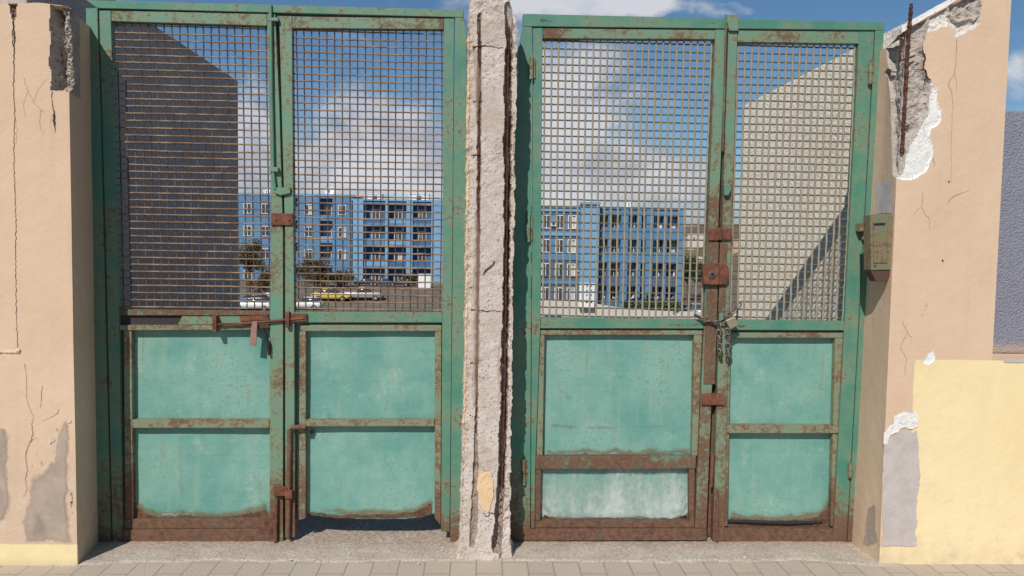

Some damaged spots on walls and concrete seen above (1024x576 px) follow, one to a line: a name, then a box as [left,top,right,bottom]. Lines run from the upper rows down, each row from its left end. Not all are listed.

spalling [48,4,81,99]
spalling [876,0,982,214]
crack [916,42,957,168]
crack [12,21,59,494]
spalling [501,36,509,487]
flaking render [923,350,935,365]
flaking render [883,411,919,445]